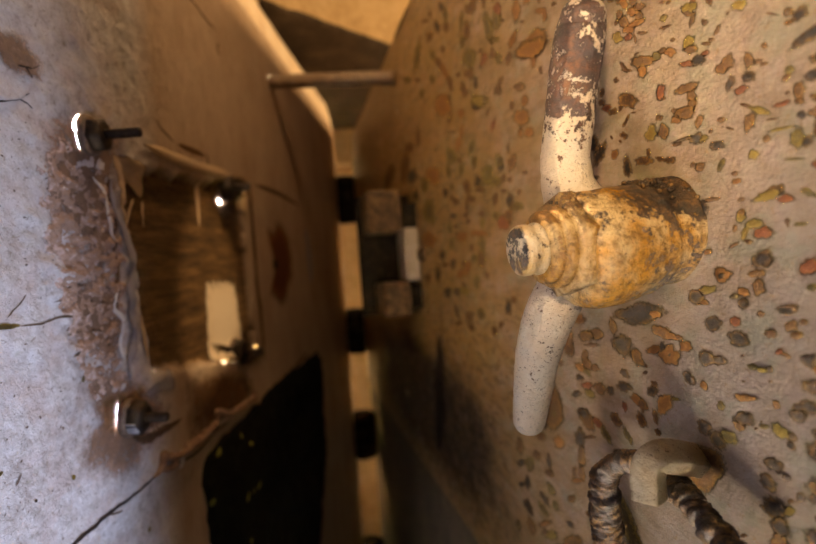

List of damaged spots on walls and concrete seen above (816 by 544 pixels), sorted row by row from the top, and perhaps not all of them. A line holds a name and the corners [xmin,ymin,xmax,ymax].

damp [0,32,42,81]
damp [483,0,502,64]
corrosion [601,0,721,83]
corrosion [598,88,638,160]
damp [769,125,805,161]
corrosion [450,144,528,235]
damp [750,189,780,203]
spalling [36,118,146,401]
corrosion [689,445,728,497]
crack [73,477,154,544]
corrosion [621,497,642,544]